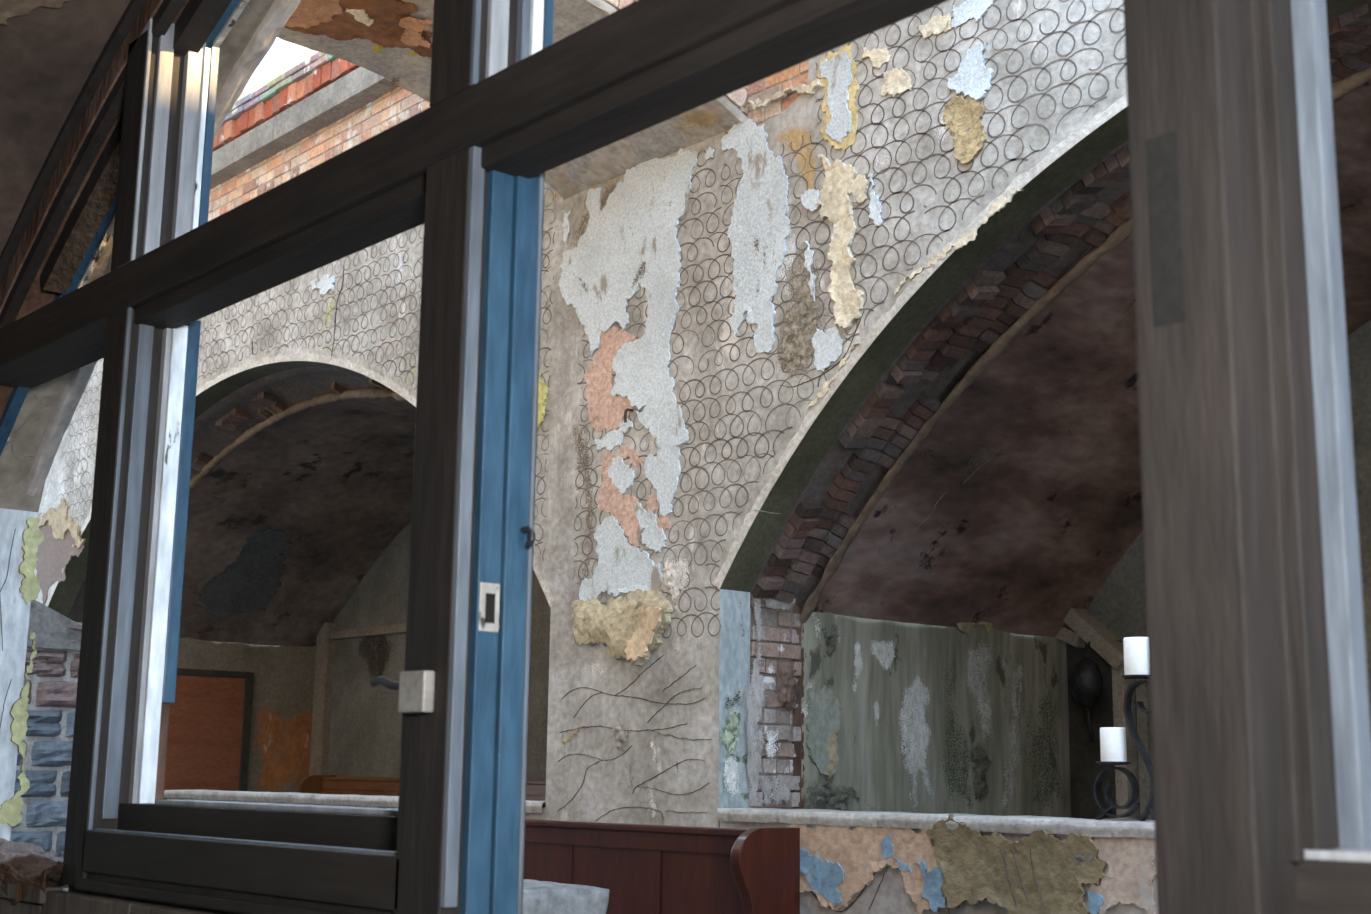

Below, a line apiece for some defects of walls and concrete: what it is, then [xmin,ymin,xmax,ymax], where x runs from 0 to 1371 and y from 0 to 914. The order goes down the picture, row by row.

spalling [284,0,433,58]
peeling [917,0,993,38]
peeling [933,42,993,164]
spalling [894,189,1023,295]
peeling [558,45,912,601]
spalling [18,498,86,604]
damp [811,613,896,693]
peeling [0,632,37,827]
damp [898,640,1068,813]
damp [803,775,875,811]
spalling [786,814,1156,914]